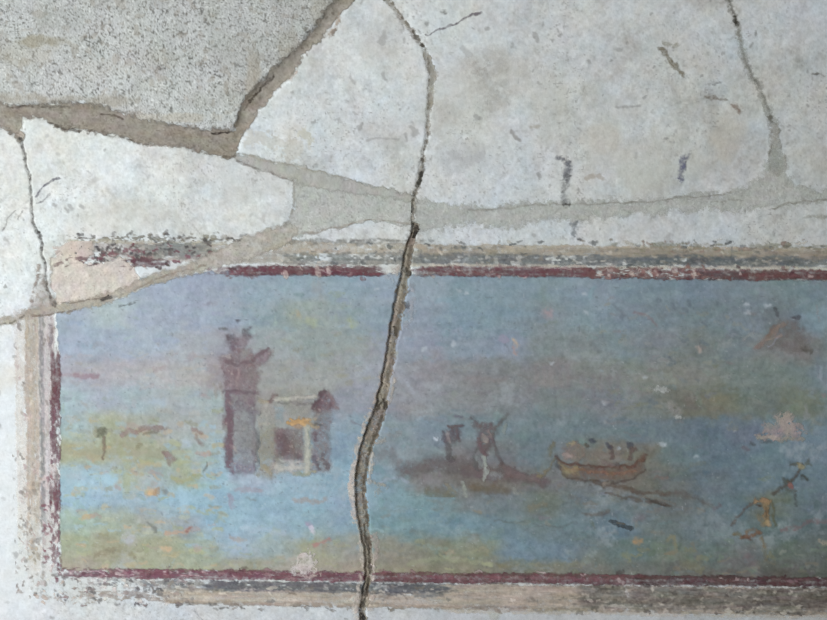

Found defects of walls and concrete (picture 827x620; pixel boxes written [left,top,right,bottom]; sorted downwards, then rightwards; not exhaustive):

crack [727,0,787,174]
flaking render [50,241,140,305]
crack [0,138,297,324]
crack [348,0,436,620]